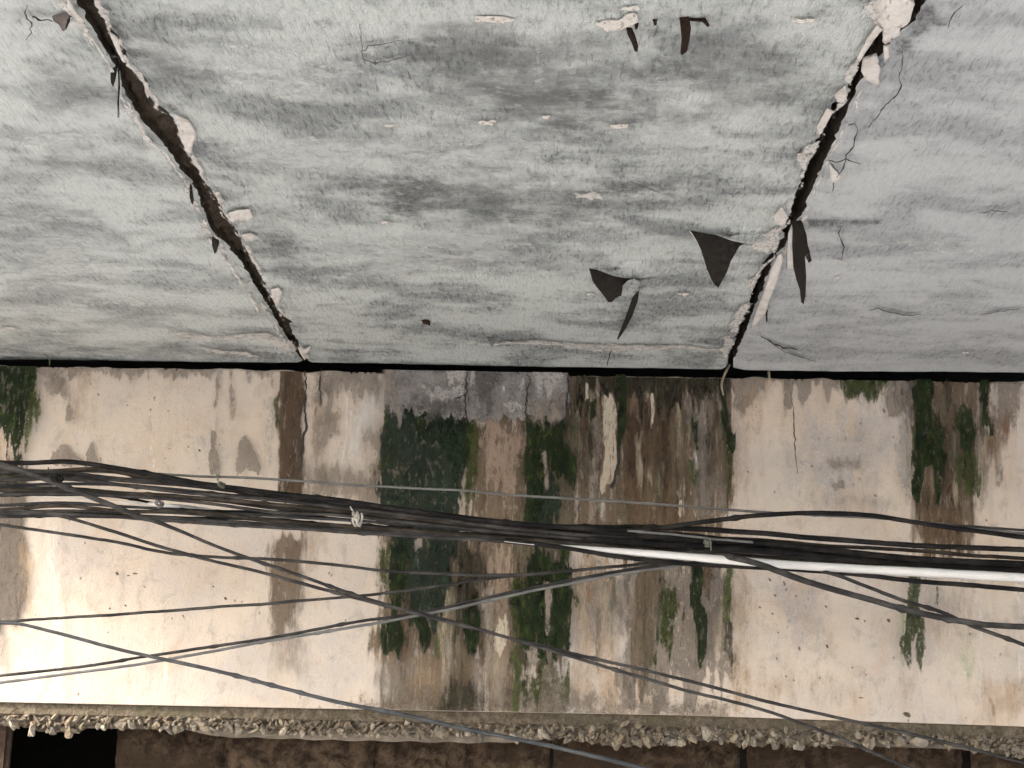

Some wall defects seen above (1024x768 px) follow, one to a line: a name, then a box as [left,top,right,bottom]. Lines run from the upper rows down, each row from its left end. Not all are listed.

peeling [481,0,883,358]
crack [829,50,903,191]
crack [761,336,815,362]
crack [868,307,921,316]
water stain [465,375,1023,558]
water stain [269,531,307,662]
water stain [368,525,736,714]